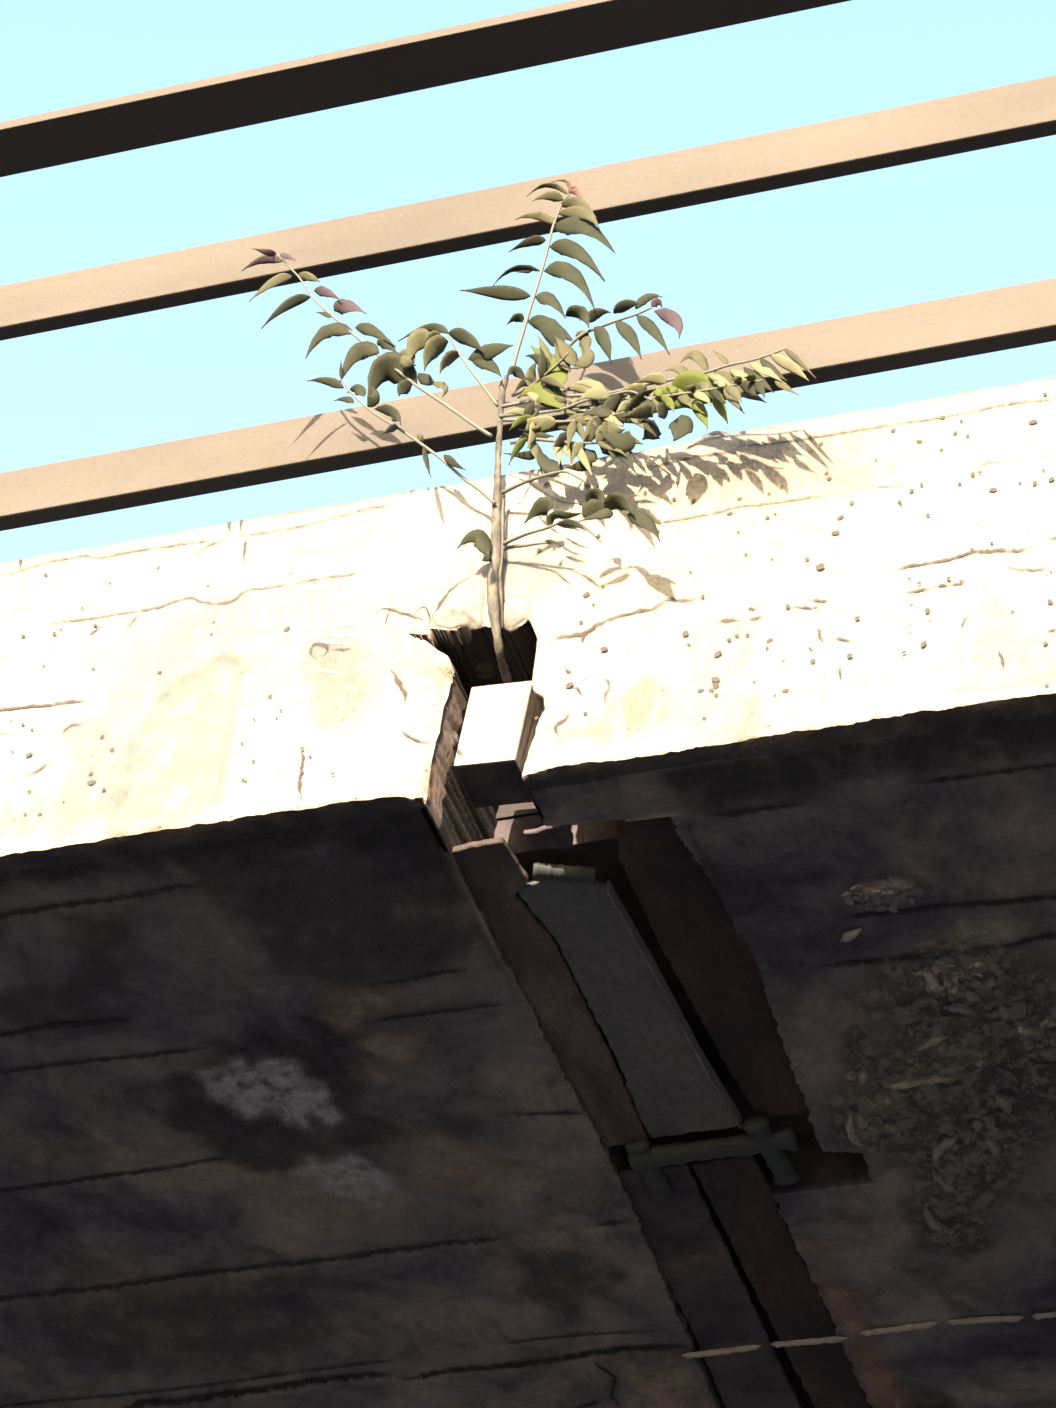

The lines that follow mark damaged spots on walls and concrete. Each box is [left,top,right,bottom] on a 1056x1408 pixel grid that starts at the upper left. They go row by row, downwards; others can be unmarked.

crack [897,536,1056,593]
damp [172,1041,393,1206]
damp [874,980,1056,1179]
crack [125,1345,684,1408]